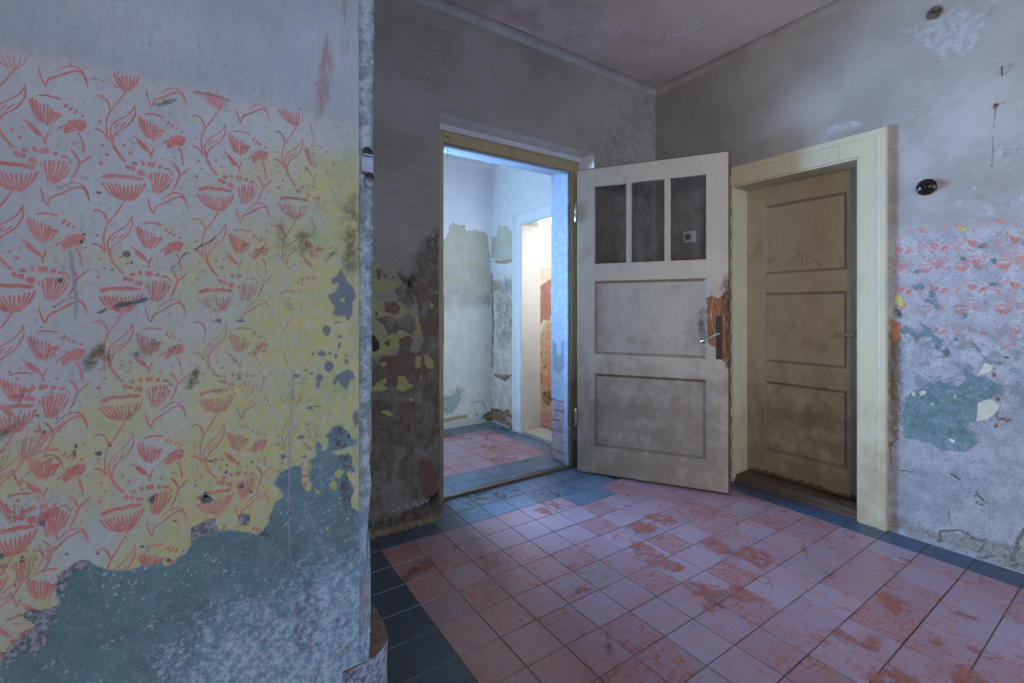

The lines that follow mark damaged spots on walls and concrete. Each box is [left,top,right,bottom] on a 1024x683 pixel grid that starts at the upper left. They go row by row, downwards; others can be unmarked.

peeling [912,269,939,309]
peeling [890,308,1004,452]
peeling [0,223,512,683]